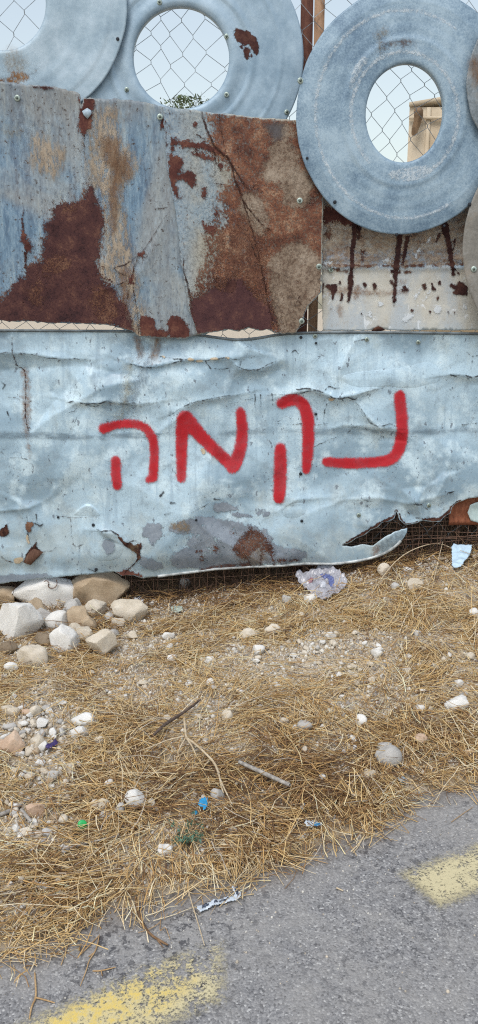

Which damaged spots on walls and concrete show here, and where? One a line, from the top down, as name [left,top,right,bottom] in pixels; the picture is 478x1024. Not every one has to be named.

corrosion [234,28,259,60]
crack [194,112,274,325]
corrosion [0,112,470,356]
corrosion [195,526,298,570]